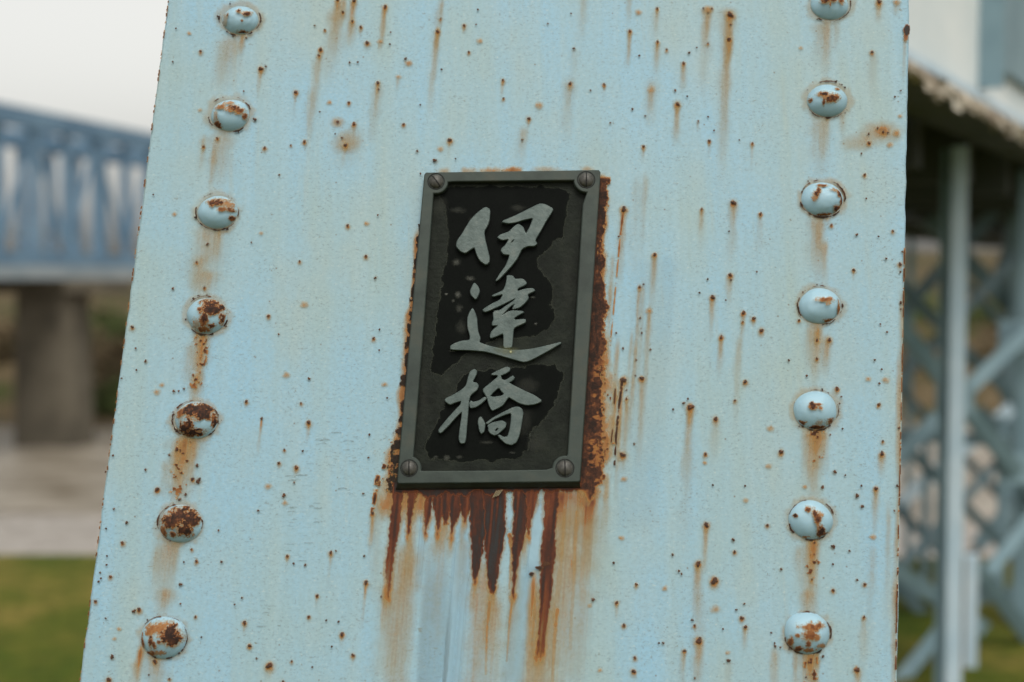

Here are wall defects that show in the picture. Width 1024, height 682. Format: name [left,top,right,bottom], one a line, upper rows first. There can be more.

corrosion [217,3,262,43]
corrosion [726,11,735,55]
corrosion [199,90,257,149]
corrosion [807,80,846,119]
corrosion [194,192,239,231]
corrosion [800,178,846,238]
corrosion [155,286,230,564]
corrosion [380,176,645,671]
corrosion [799,386,844,462]
corrosion [789,485,836,598]
corrosion [132,608,202,676]
corrosion [770,611,832,682]